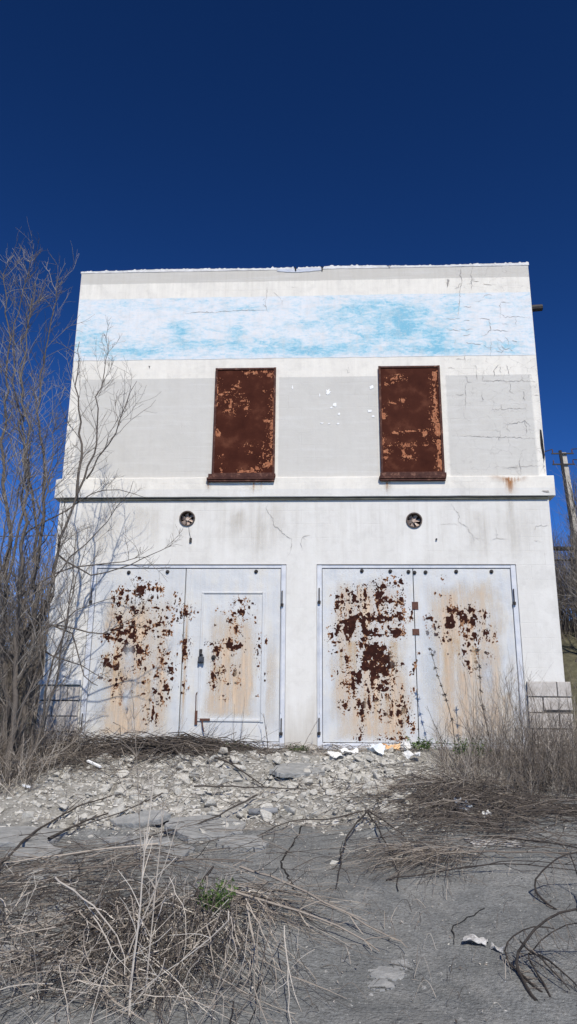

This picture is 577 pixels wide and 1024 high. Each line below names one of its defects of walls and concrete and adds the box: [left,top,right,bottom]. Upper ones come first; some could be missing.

crack [447,271,544,469]
corrosion [92,574,199,735]
corrosion [204,594,271,715]
corrosion [326,574,507,744]